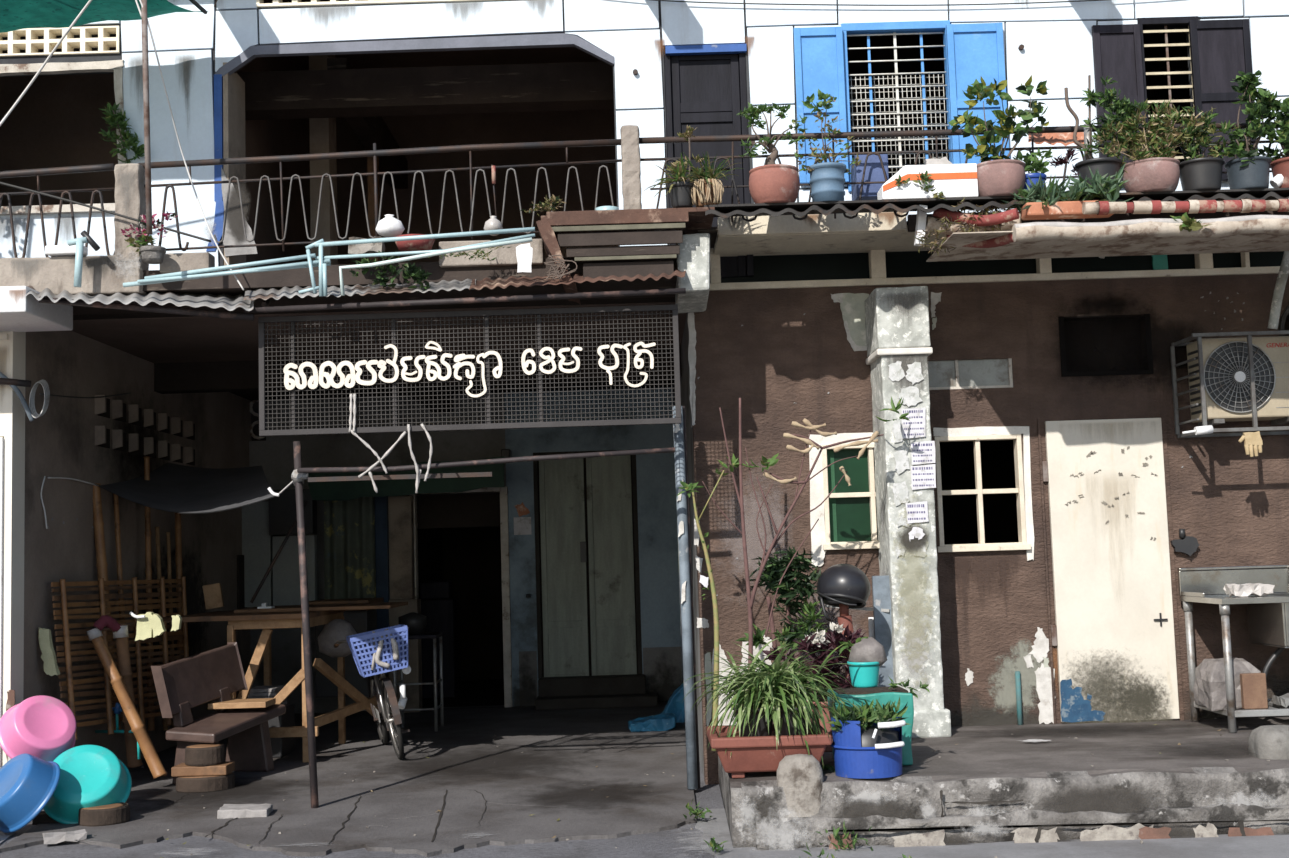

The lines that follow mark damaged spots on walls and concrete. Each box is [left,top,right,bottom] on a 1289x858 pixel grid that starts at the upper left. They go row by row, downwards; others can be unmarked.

water stain [180,59,189,84]
peeling [1023,627,1055,724]
water stain [835,791,934,819]
water stain [943,808,1004,845]
water stain [1035,786,1160,842]
water stain [1158,823,1206,838]
water stain [1231,793,1270,806]